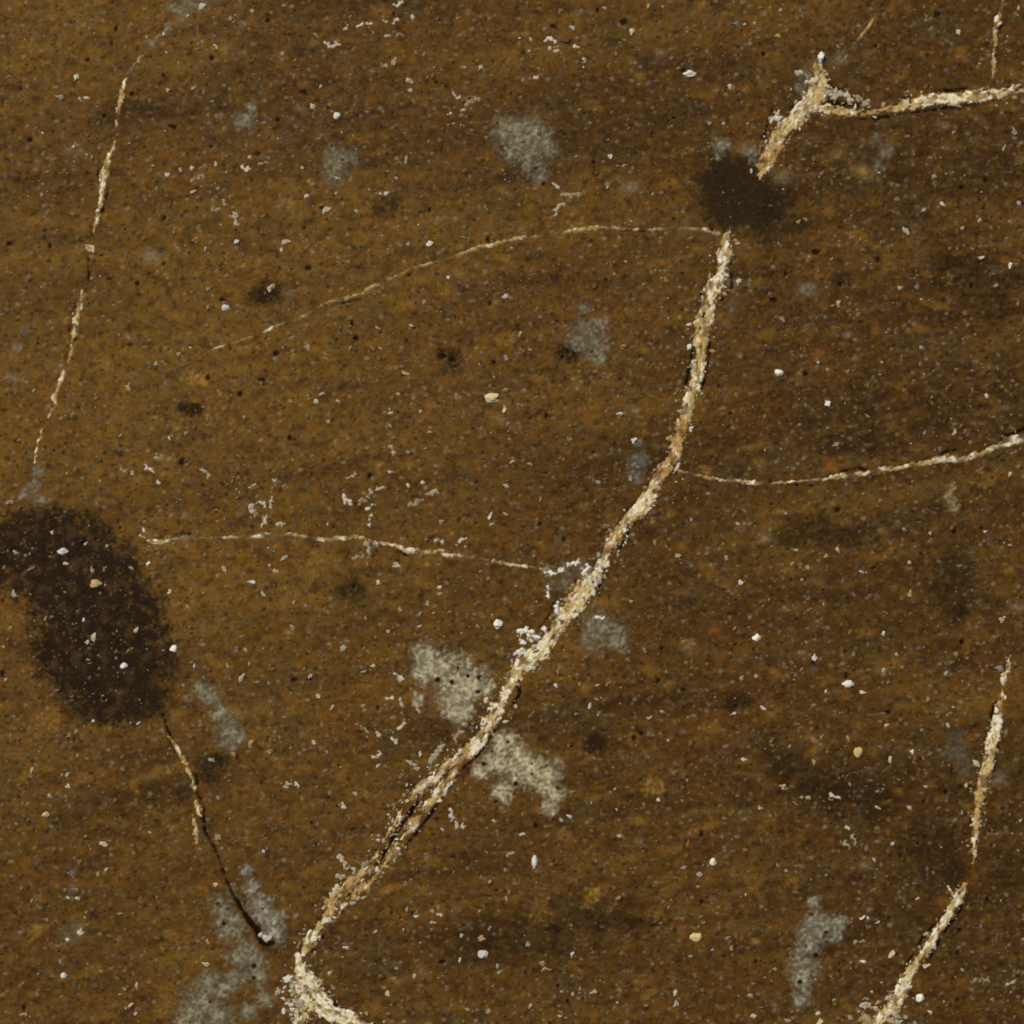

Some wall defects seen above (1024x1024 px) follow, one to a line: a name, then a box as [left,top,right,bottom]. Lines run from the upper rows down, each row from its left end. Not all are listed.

crack [33,8,188,464]
damp [696,151,800,232]
crack [755,3,1024,180]
damp [0,506,174,738]
crack [139,527,191,550]
crack [162,225,1024,1024]